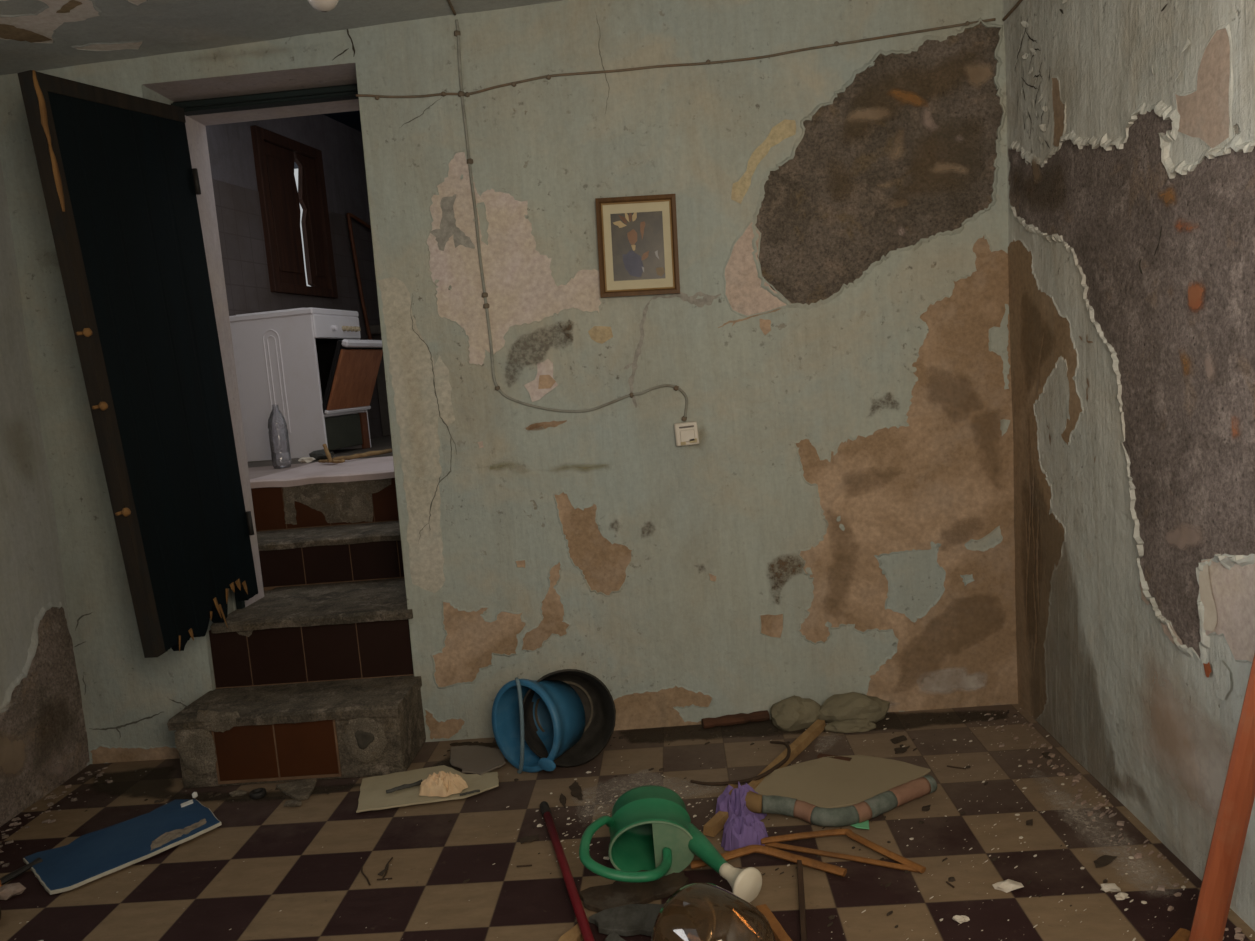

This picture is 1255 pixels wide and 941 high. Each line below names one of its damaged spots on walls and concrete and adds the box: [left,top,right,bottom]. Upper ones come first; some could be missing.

peeling [0,0,103,44]
peeling [426,151,613,367]
crack [410,293,457,539]
peeling [523,358,559,402]
spalling [722,18,1255,719]
peeling [430,490,634,689]
spalling [0,601,180,827]
peeling [613,684,714,731]